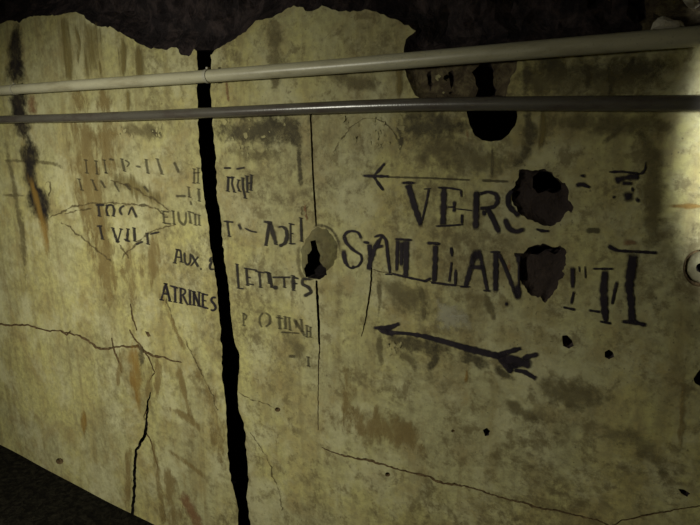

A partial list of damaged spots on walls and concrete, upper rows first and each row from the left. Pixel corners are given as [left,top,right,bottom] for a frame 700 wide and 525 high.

leakage [7,27,23,83]
flaking render [0,0,700,56]
flaking render [405,60,518,98]
hole [467,111,517,142]
leakage [7,94,56,265]
flaking render [511,169,573,226]
crack [0,50,283,525]
flaking render [514,243,567,303]